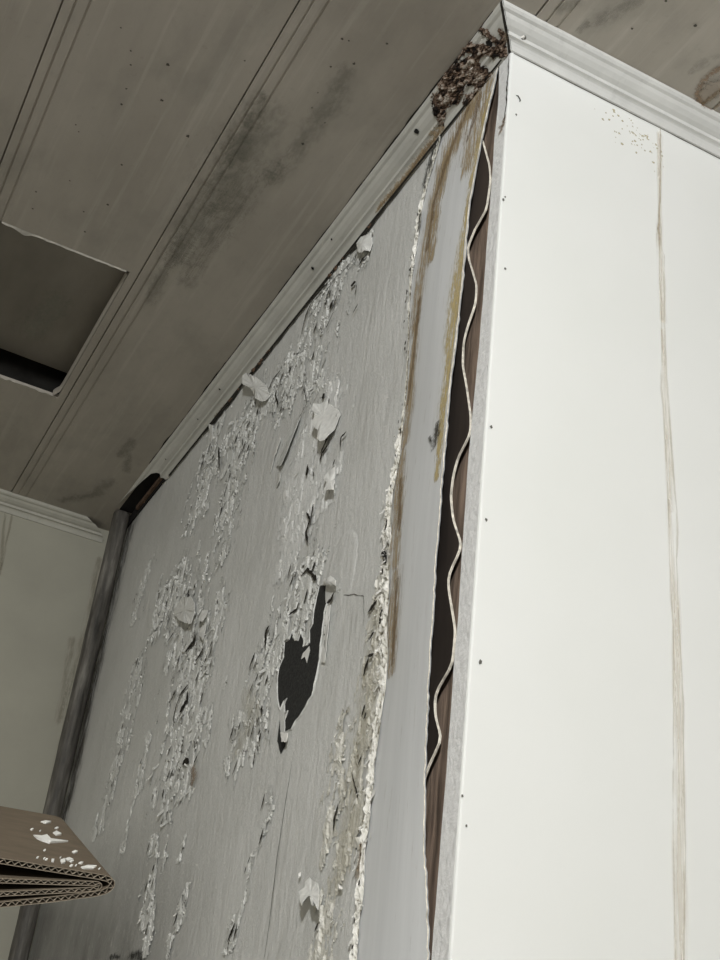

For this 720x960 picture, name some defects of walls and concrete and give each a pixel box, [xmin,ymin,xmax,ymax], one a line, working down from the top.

peeling [91,227,383,960]
water stain [387,75,494,678]